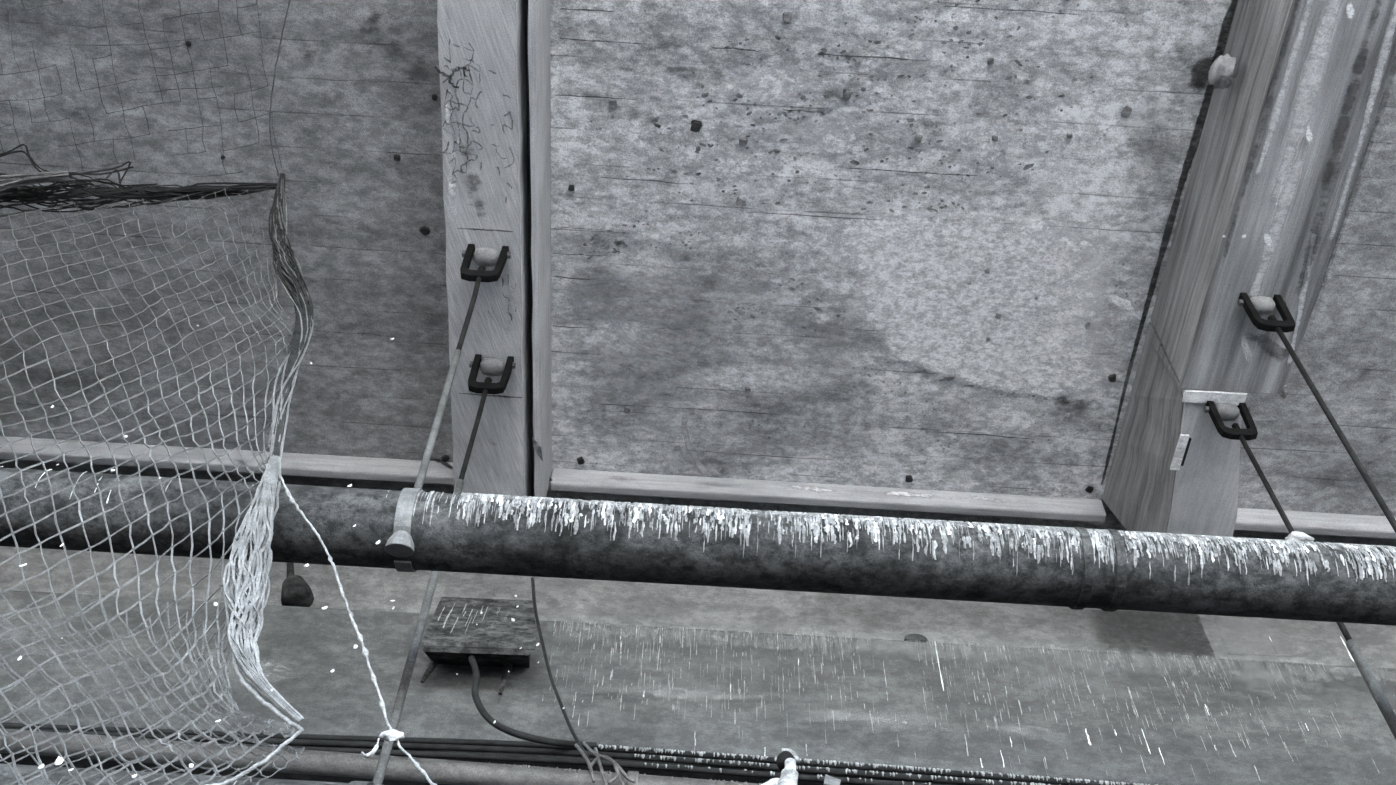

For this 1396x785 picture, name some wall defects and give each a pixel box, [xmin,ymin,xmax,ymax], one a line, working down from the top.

damp [413,490,1396,585]
damp [542,598,899,747]
damp [914,610,1343,782]